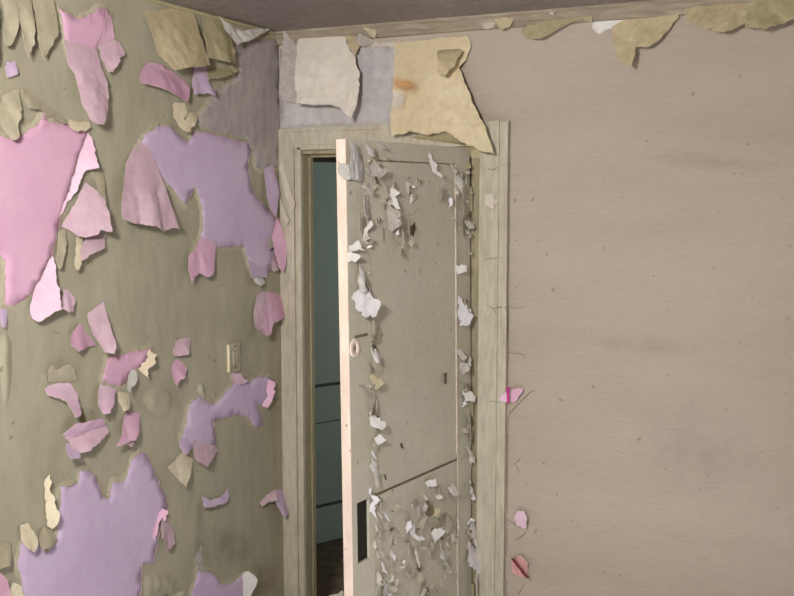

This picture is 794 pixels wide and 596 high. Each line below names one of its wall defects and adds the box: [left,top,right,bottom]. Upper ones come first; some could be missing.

peeling [59,8,109,50]
peeling [0,113,88,306]
peeling [141,35,396,272]
peeling [102,348,152,387]
peeling [182,373,275,449]
peeling [337,141,481,596]
peeling [17,452,168,596]
peeling [191,571,243,596]